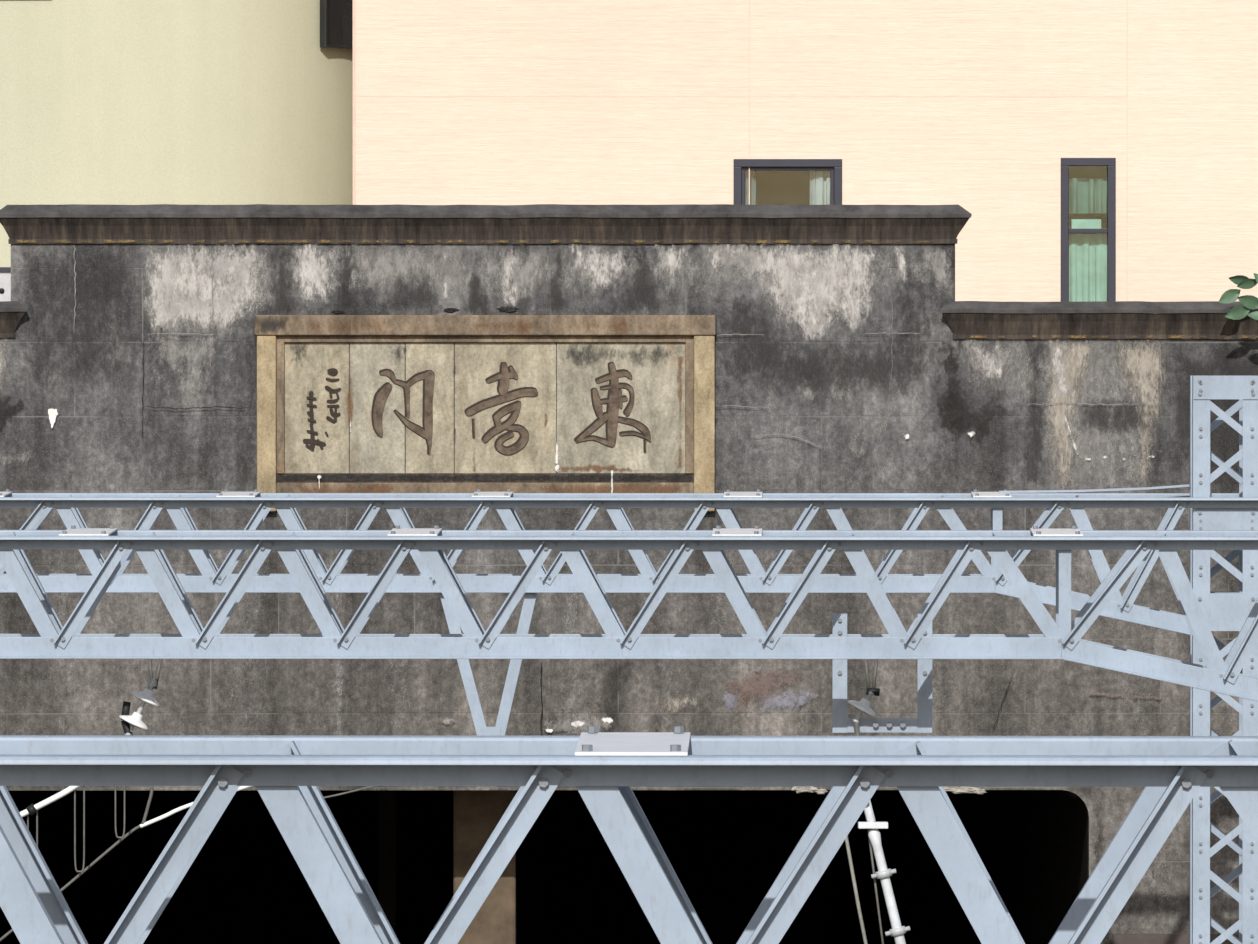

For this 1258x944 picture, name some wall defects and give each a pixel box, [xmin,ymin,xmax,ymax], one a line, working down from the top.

water stain [146,244,951,406]
water stain [0,397,24,431]
water stain [938,341,1162,485]